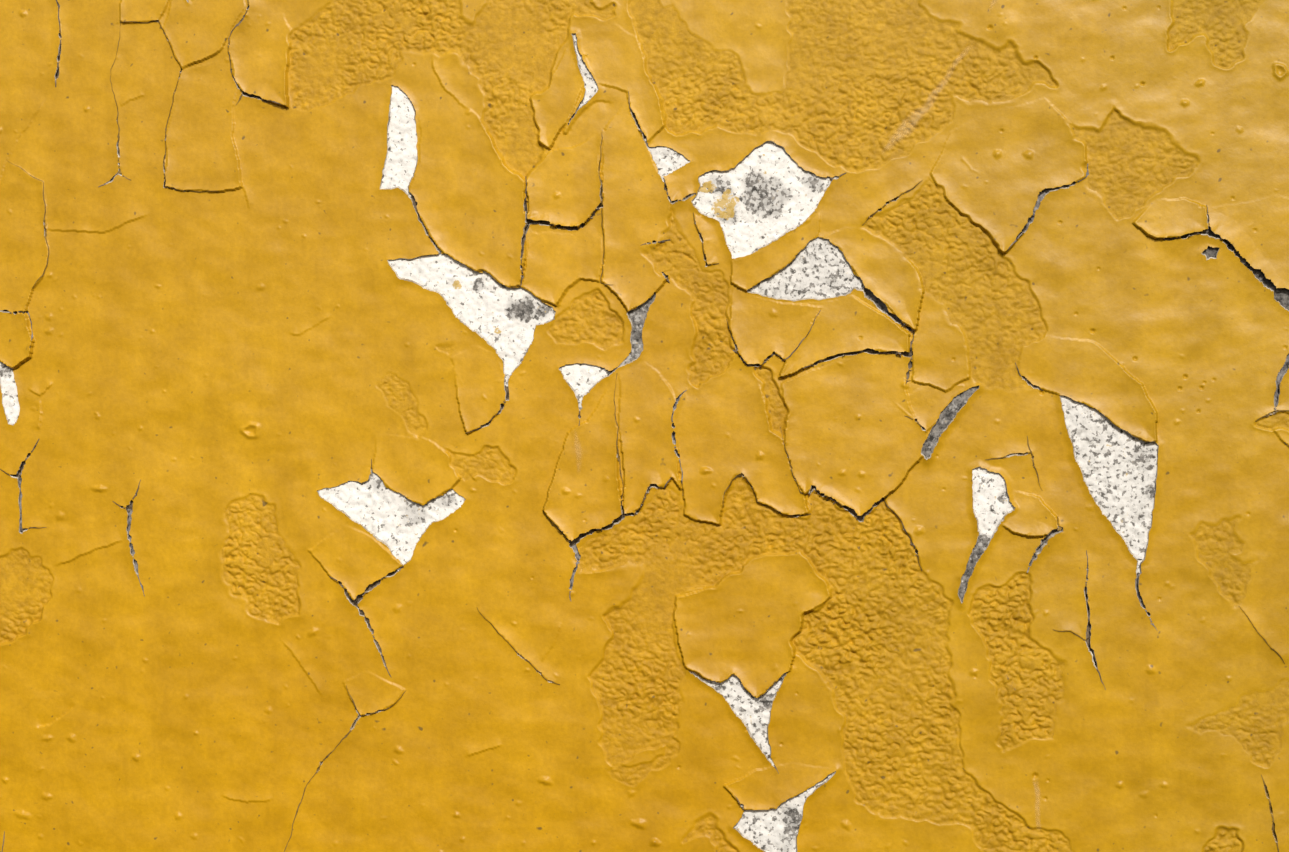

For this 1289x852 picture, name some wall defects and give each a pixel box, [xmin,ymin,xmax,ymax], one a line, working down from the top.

peeling [0,160,146,429]
crack [520,137,610,306]
crack [862,135,1089,255]
crack [1134,205,1289,310]
peeling [222,495,301,625]
crack [280,548,405,852]
crack [477,375,686,685]
peeling [288,0,1158,852]
crack [779,309,929,521]
crack [985,436,1062,573]
crack [1055,550,1106,690]
crack [1255,354,1289,447]